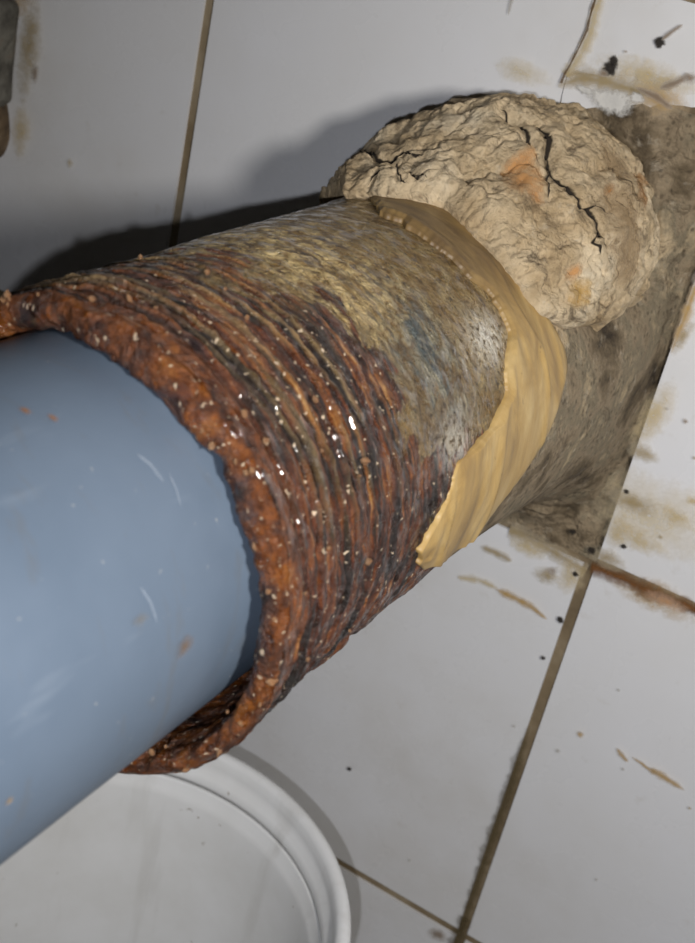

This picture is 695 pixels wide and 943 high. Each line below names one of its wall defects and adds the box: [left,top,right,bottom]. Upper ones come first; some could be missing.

crack [360,150,426,183]
crack [503,110,606,254]
leakage [673,277,695,348]
leakage [508,527,587,583]
rust [590,553,695,612]